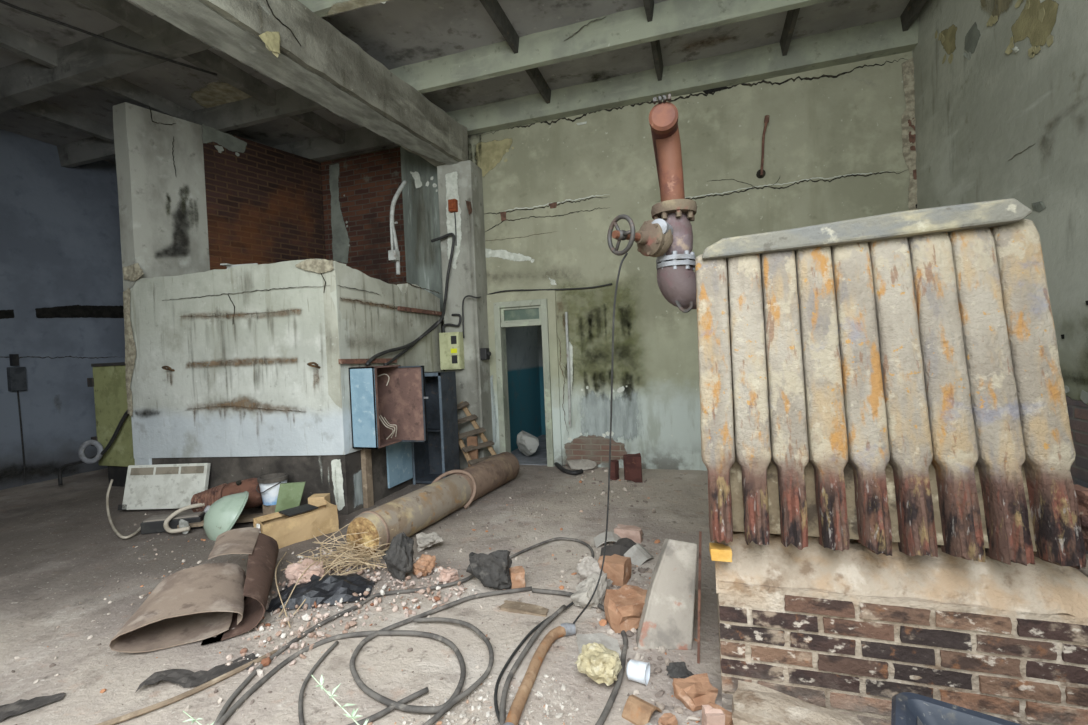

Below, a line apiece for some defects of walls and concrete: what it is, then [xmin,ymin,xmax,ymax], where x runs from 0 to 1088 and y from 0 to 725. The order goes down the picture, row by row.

peeling [935,0,1059,64]
crack [487,58,907,134]
spalling [901,58,917,210]
crack [685,170,906,200]
crack [485,194,610,241]
corrosion [179,309,300,318]
corrosion [187,358,297,367]
water stain [579,309,629,393]
corrosion [184,398,302,421]